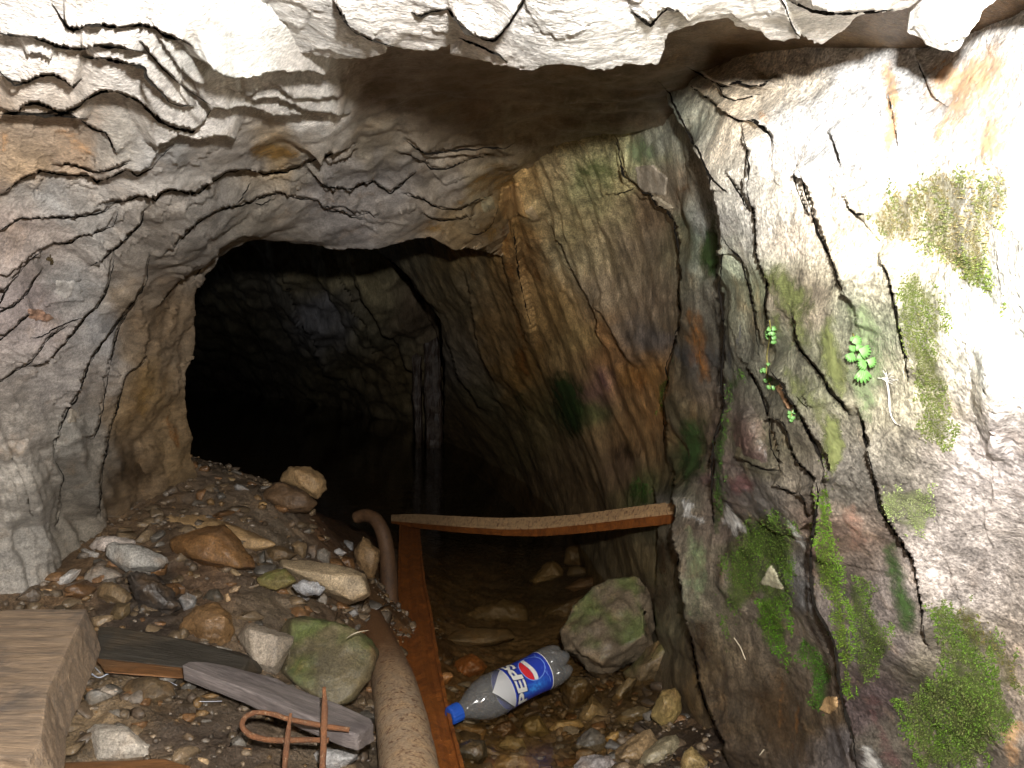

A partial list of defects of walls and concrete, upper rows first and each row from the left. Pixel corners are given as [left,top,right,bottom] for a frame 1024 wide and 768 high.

crack [0,0,532,526]
crack [659,67,929,766]